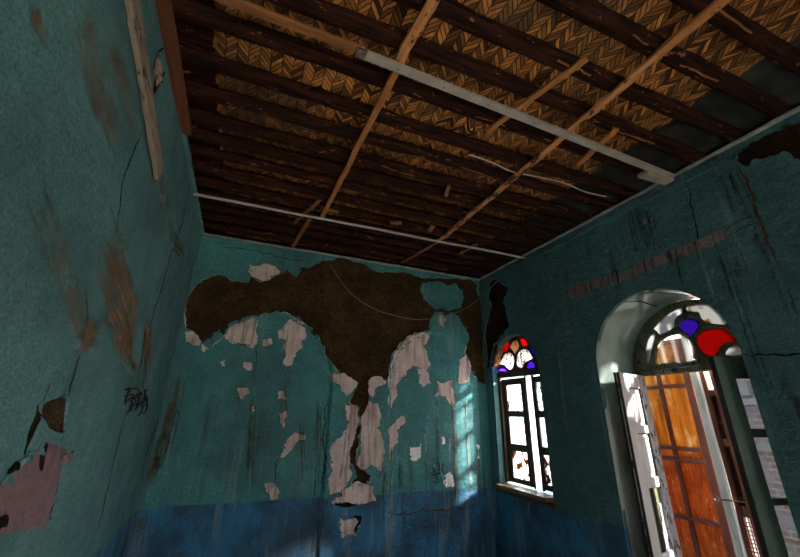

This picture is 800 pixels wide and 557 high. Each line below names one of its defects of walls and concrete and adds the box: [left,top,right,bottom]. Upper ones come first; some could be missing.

crack [111,132,142,259]
crack [686,182,699,244]
crack [728,163,778,264]
flaking render [732,123,800,166]
flaking render [184,257,509,538]
peeling [0,393,74,535]